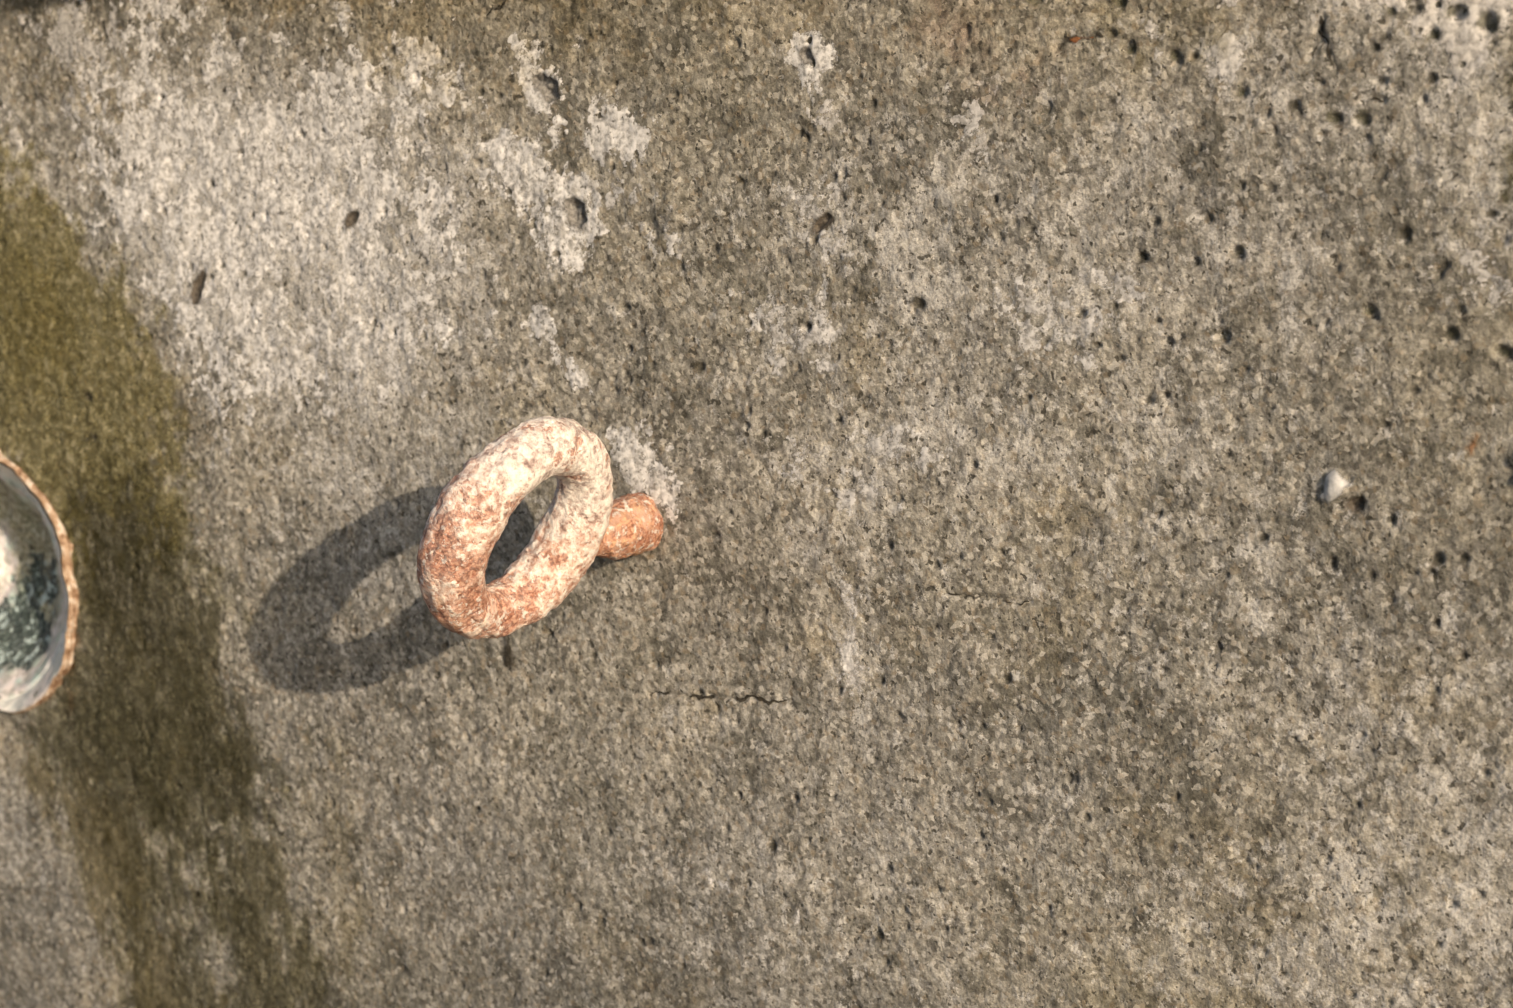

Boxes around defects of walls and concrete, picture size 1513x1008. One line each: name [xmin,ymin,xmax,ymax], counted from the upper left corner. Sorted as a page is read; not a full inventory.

leakage [206,822,325,1008]